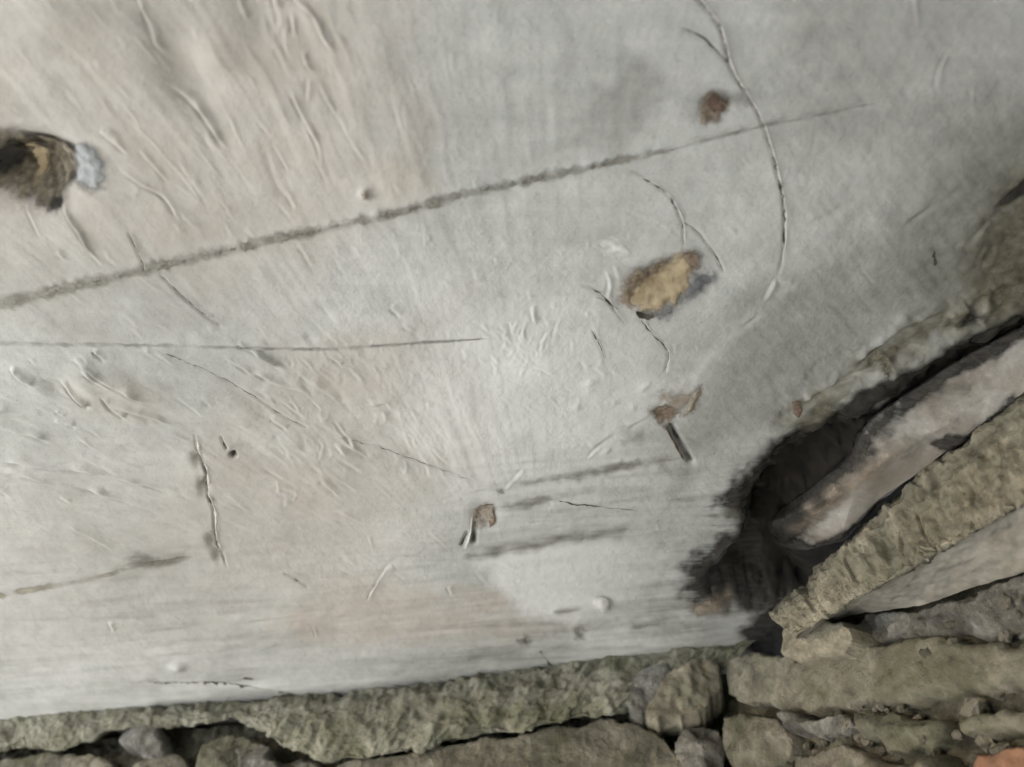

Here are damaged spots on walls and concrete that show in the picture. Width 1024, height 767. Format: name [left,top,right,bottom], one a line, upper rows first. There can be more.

crack [130,233,221,326]
crack [630,169,723,270]
crack [687,0,788,270]
leakage [998,180,1024,206]
crack [196,437,228,564]
leakage [680,313,1024,657]